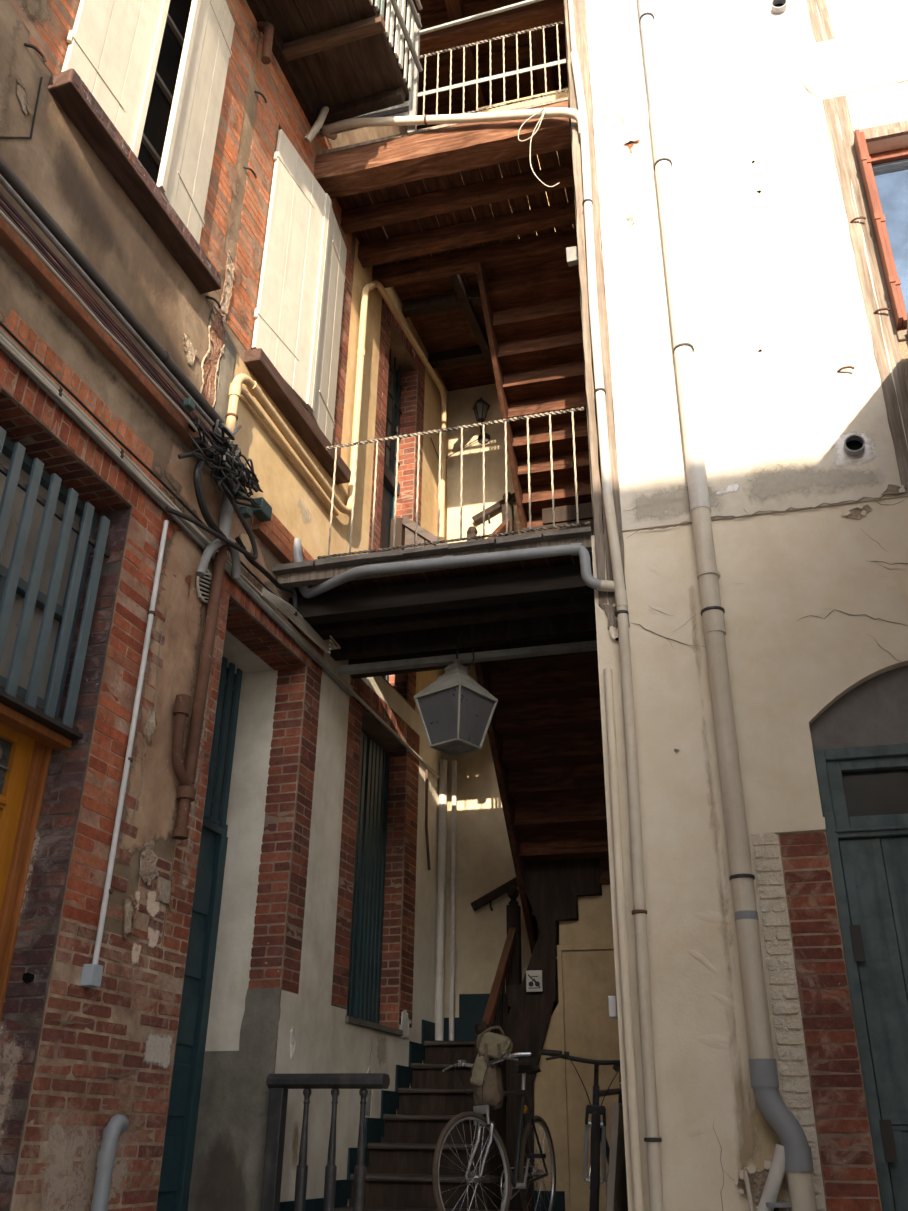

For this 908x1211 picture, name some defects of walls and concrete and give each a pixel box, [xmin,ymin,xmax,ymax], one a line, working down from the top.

flaking render [183,250,236,407]
water stain [636,487,690,516]
crack [626,491,907,538]
water stain [750,467,874,499]
crack [799,609,907,665]
flaking render [123,839,175,963]